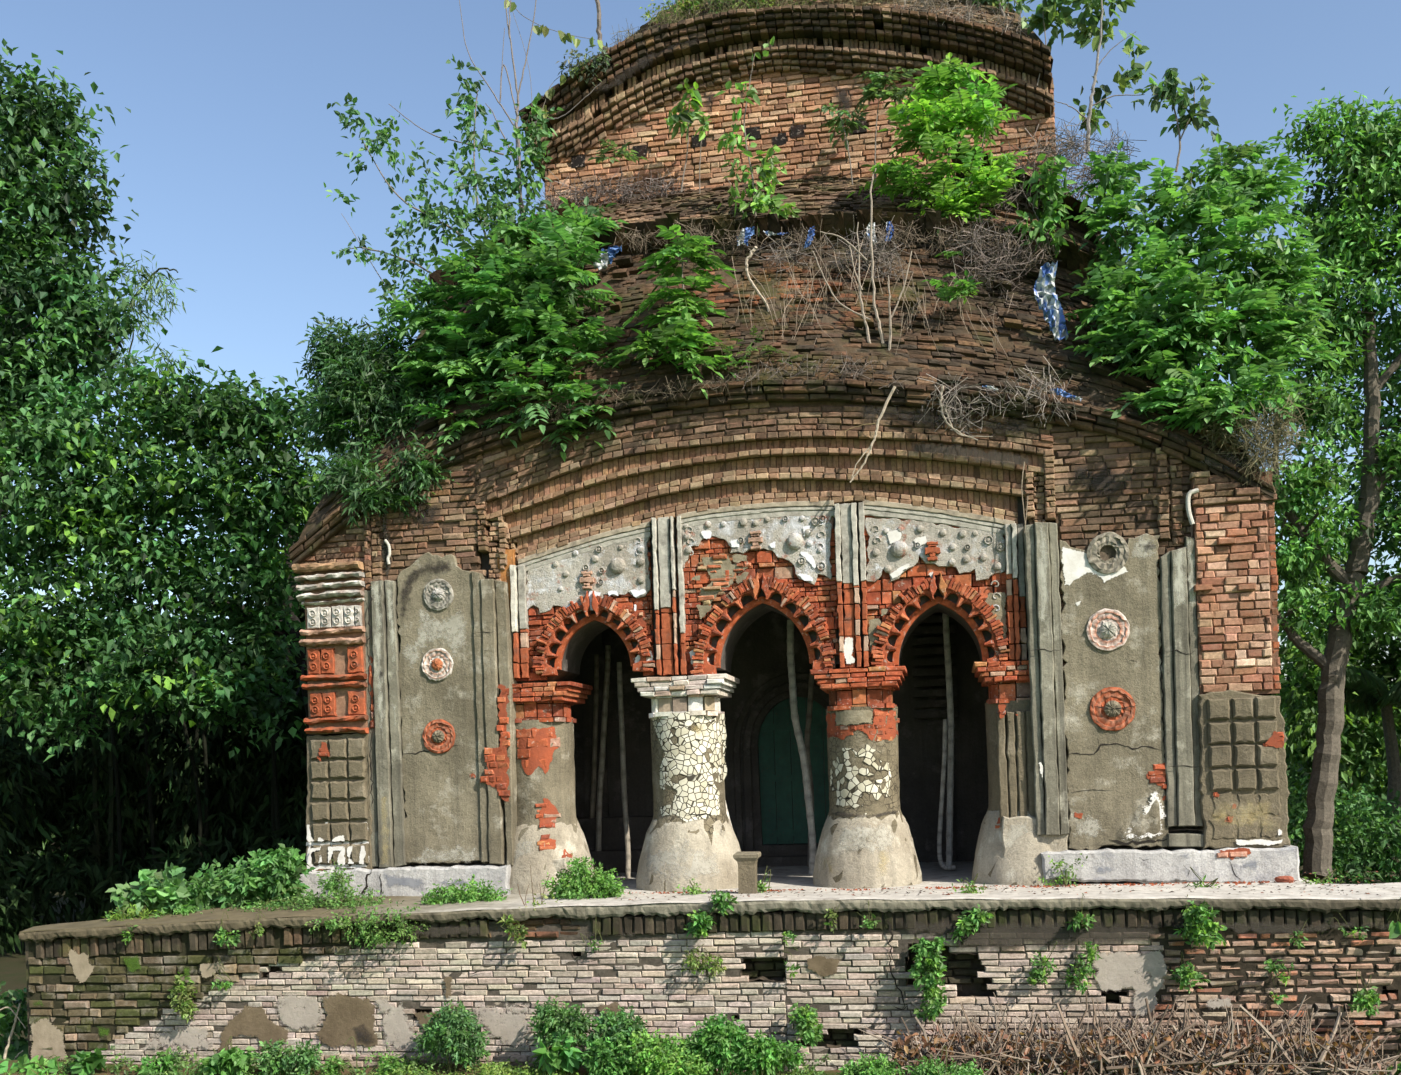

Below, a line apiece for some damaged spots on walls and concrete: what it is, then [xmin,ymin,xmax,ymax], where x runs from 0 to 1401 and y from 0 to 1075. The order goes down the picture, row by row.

spalling [692,539,751,619]
peeling [798,525,817,581]
peeling [890,563,910,579]
peeling [887,530,927,546]
peeling [1061,547,1128,585]
spalling [589,589,648,627]
spalling [843,609,888,664]
spalling [984,592,1007,640]
crack [1068,616,1195,768]
spalling [469,684,561,802]
spalling [1146,763,1167,800]
spalling [740,958,786,981]